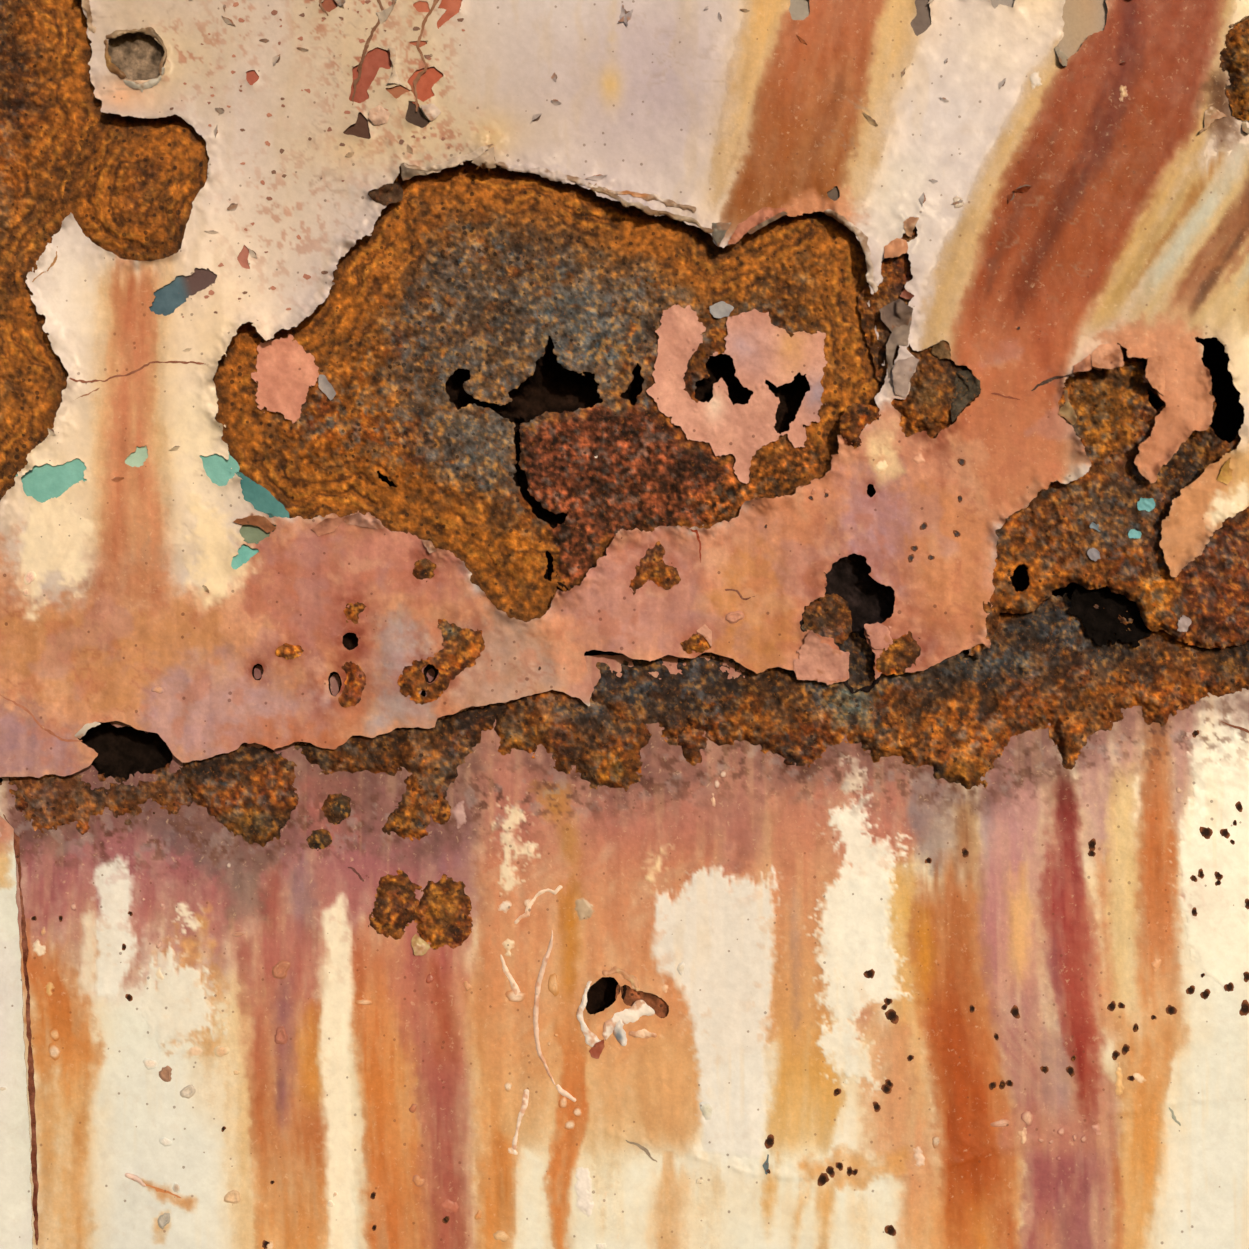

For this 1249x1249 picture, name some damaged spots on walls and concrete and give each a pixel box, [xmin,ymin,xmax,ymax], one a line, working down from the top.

peeling [319,0,443,146]
peeling [413,0,465,31]
peeling [910,0,931,36]
peeling [1054,0,1108,66]
peeling [149,222,255,318]
corrosion [0,0,652,847]
corrosion [213,0,1249,789]
peeling [16,458,87,503]
peeling [199,451,289,570]
peeling [793,630,850,685]
peeling [864,622,893,650]
corrosion [0,699,1202,1249]